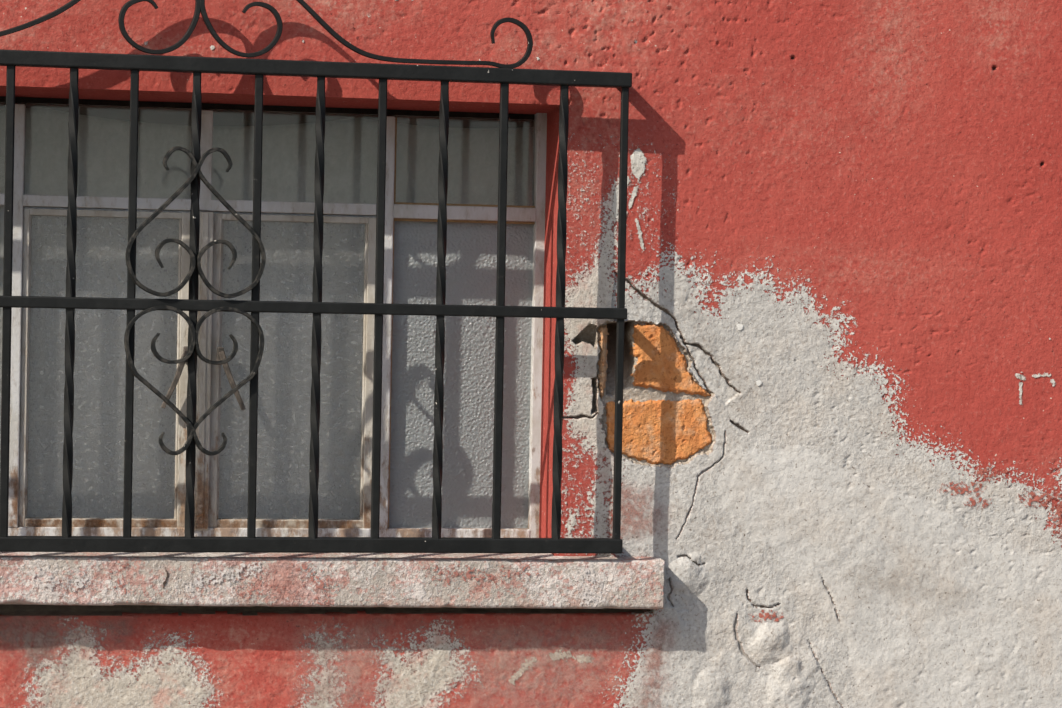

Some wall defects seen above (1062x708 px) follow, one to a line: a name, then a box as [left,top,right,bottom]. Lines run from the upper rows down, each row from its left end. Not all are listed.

crack [614,272,741,393]
crack [563,378,599,419]
peeling [557,134,1062,708]
crack [821,577,839,621]
peeling [21,617,223,708]
peeling [291,617,483,708]
peeling [508,649,593,685]
crack [809,643,843,708]